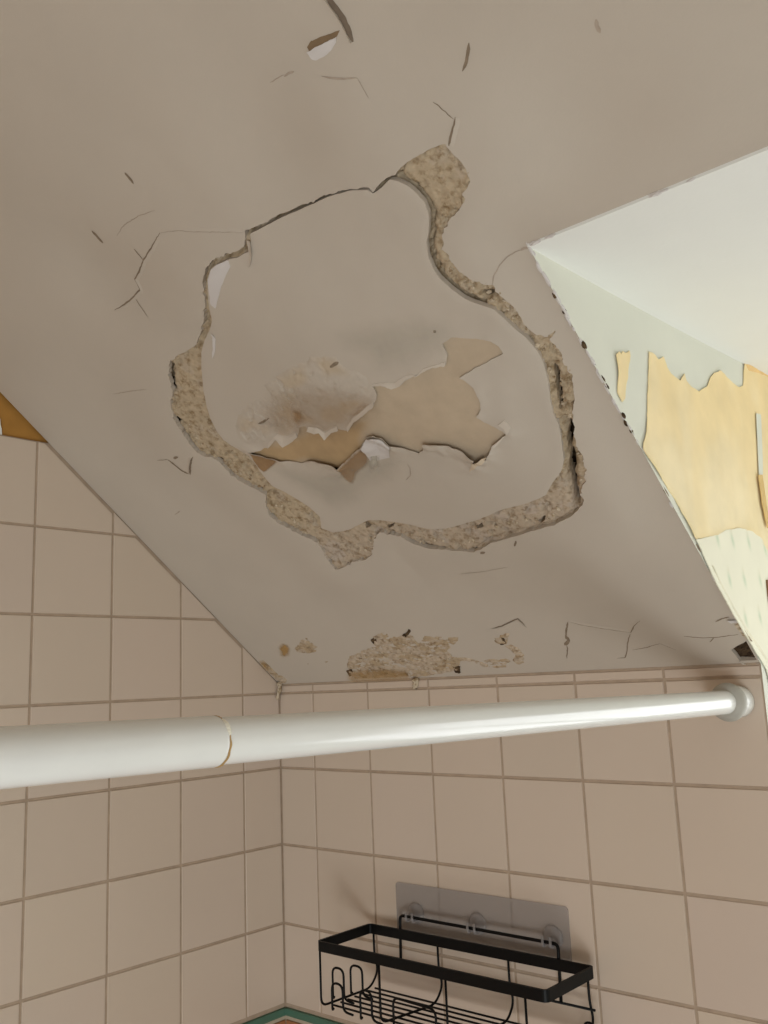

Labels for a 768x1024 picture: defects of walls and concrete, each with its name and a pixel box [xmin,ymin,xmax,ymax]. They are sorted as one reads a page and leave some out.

crack [462,43,470,71]
crack [321,76,368,97]
crack [433,102,460,147]
crack [92,211,163,314]
spalling [171,144,587,568]
spalling [526,233,645,453]
damp [338,451,377,483]
spalling [346,629,524,689]
crack [564,619,640,659]